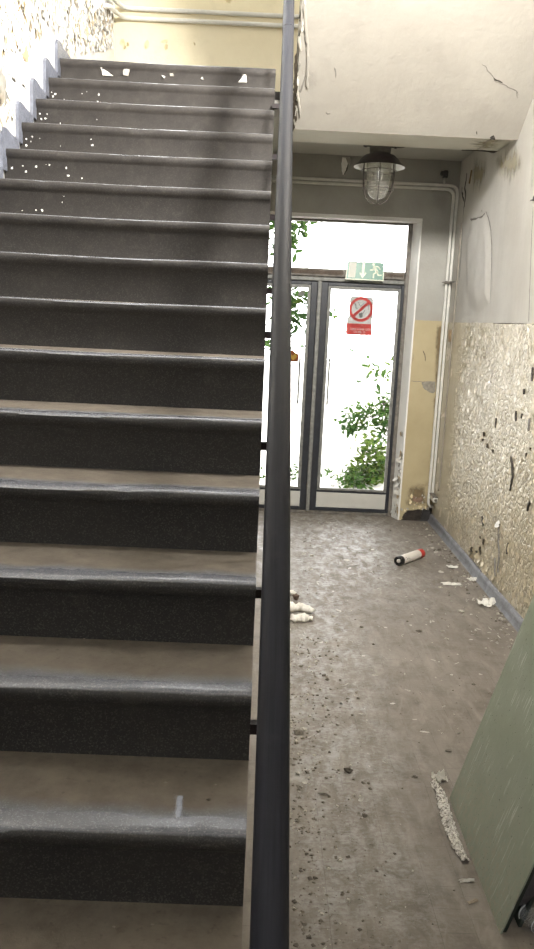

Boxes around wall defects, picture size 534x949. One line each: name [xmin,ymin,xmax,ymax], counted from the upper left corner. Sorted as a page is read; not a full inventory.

peeling [0,0,130,129]
peeling [390,323,534,653]